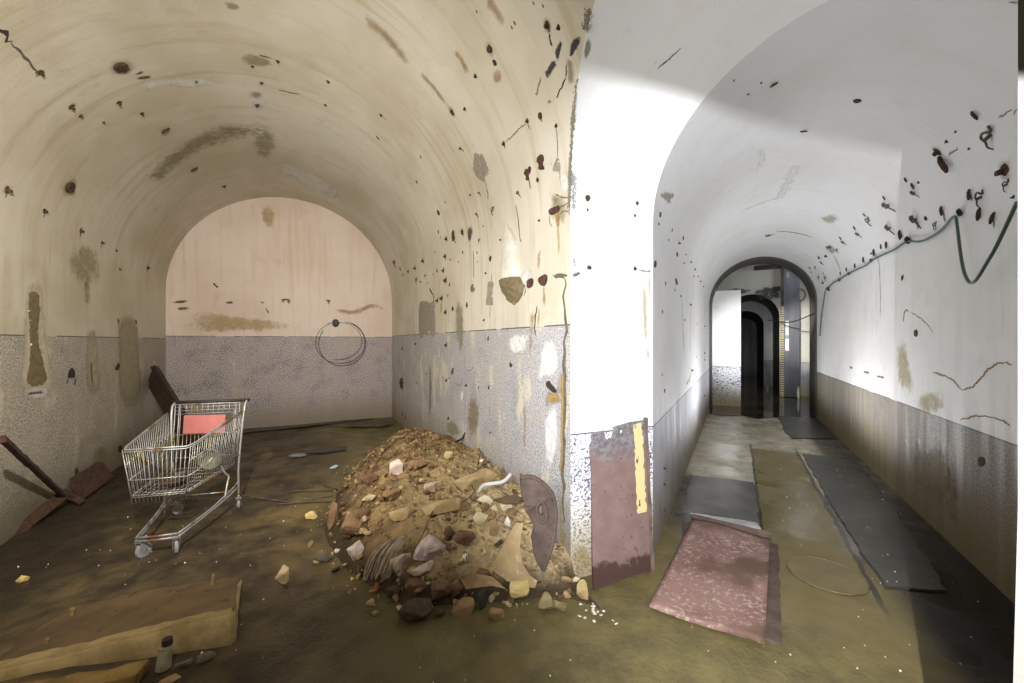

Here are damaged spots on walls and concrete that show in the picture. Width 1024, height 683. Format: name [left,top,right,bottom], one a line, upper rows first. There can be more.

crack [0,29,39,74]
flaking render [21,287,52,398]
crack [933,362,1012,390]
crack [960,414,1010,426]